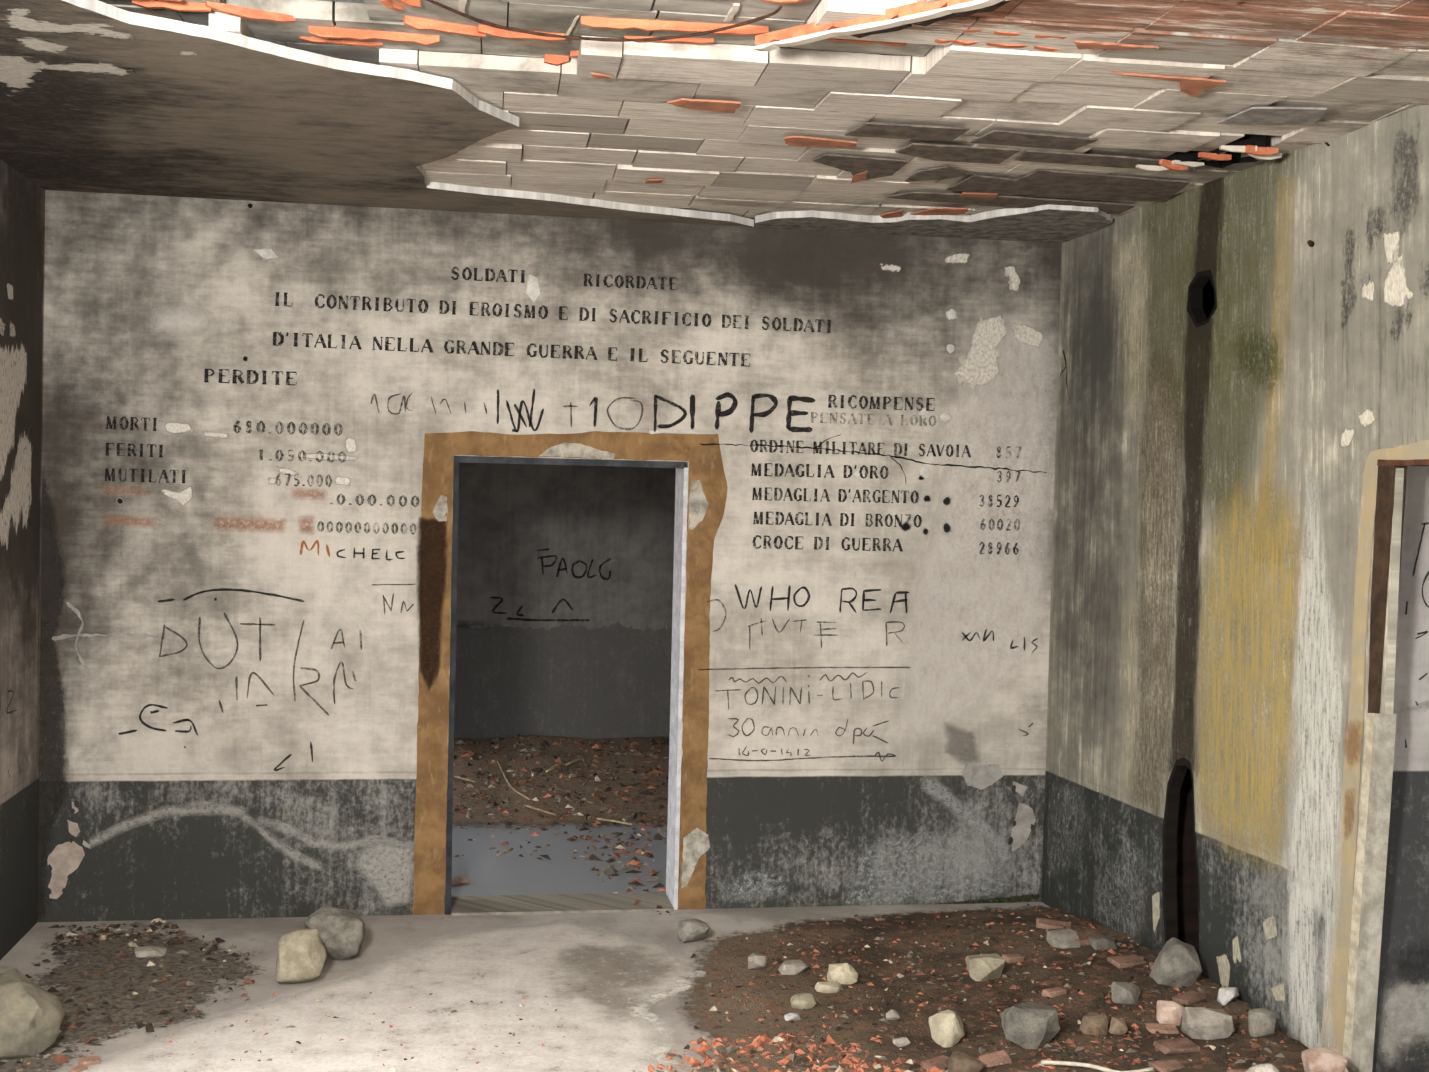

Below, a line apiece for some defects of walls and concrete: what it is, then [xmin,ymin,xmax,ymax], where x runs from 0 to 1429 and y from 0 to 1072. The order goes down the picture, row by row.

peeling [0,6,137,96]
spalling [752,0,1013,51]
peeling [667,98,740,113]
peeling [1112,71,1226,97]
peeling [880,192,998,218]
peeling [945,253,969,264]
peeling [1004,266,1020,291]
peeling [1341,133,1429,340]
peeling [947,316,1043,390]
peeling [0,319,33,549]
peeling [1341,409,1375,448]
peeling [44,801,91,899]